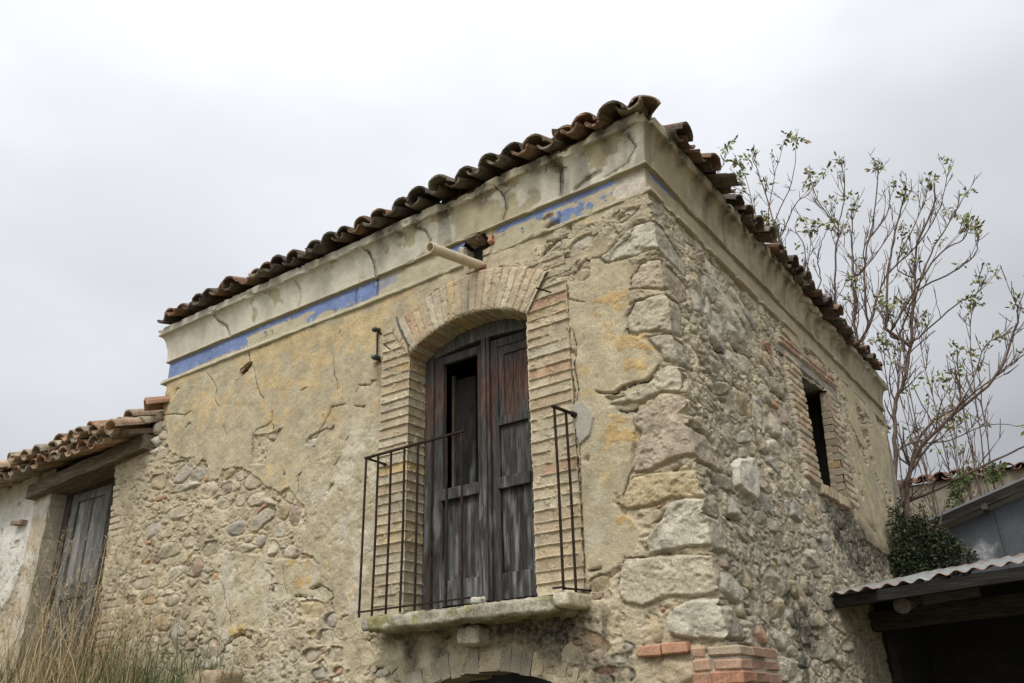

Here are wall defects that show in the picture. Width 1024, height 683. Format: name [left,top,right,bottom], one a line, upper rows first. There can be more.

spalling [458,169,653,284]
peeling [188,314,298,371]
spalling [129,429,308,607]
spalling [219,623,268,667]